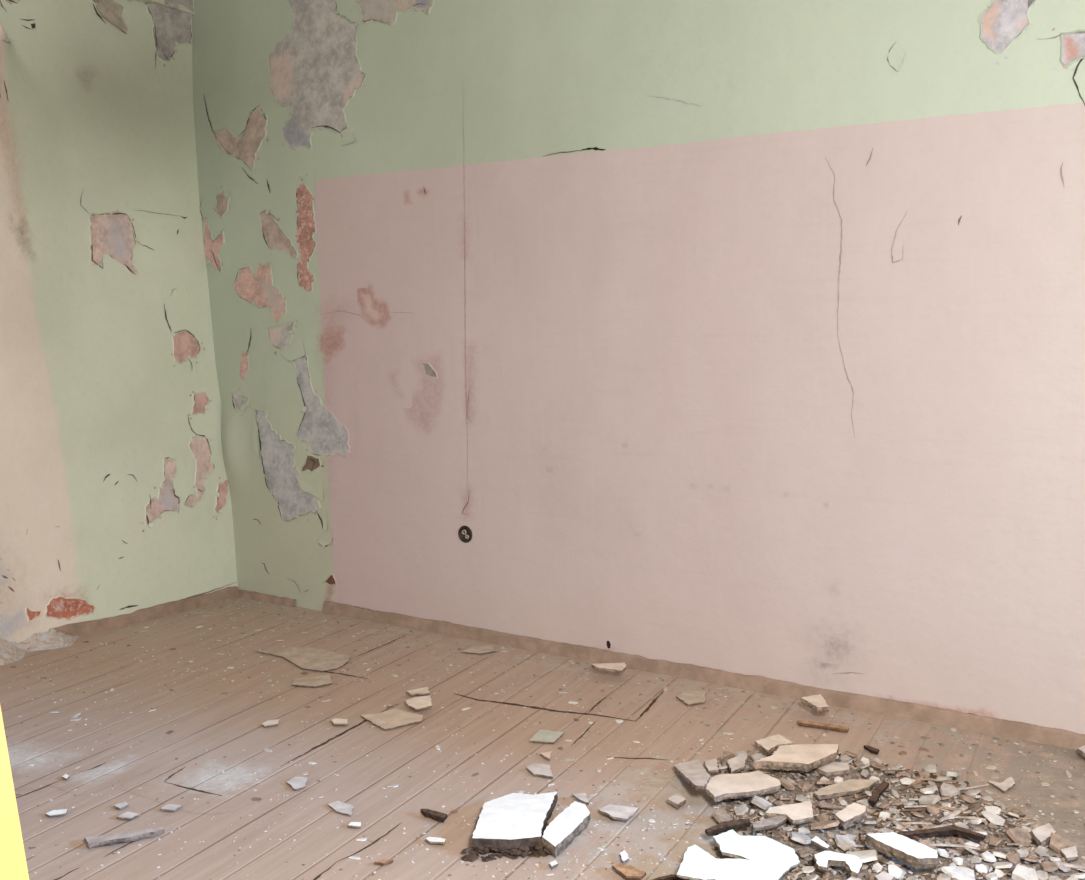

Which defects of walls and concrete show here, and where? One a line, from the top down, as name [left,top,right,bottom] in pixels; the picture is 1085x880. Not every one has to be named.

peeling [90,0,131,34]
peeling [145,0,194,68]
peeling [203,0,434,184]
peeling [977,0,1038,65]
peeling [1047,28,1085,105]
peeling [80,192,187,276]
peeling [200,186,231,273]
peeling [164,288,205,367]
peeling [232,176,352,531]
crack [826,159,855,436]
peeling [141,391,229,532]
peeling [0,481,107,633]